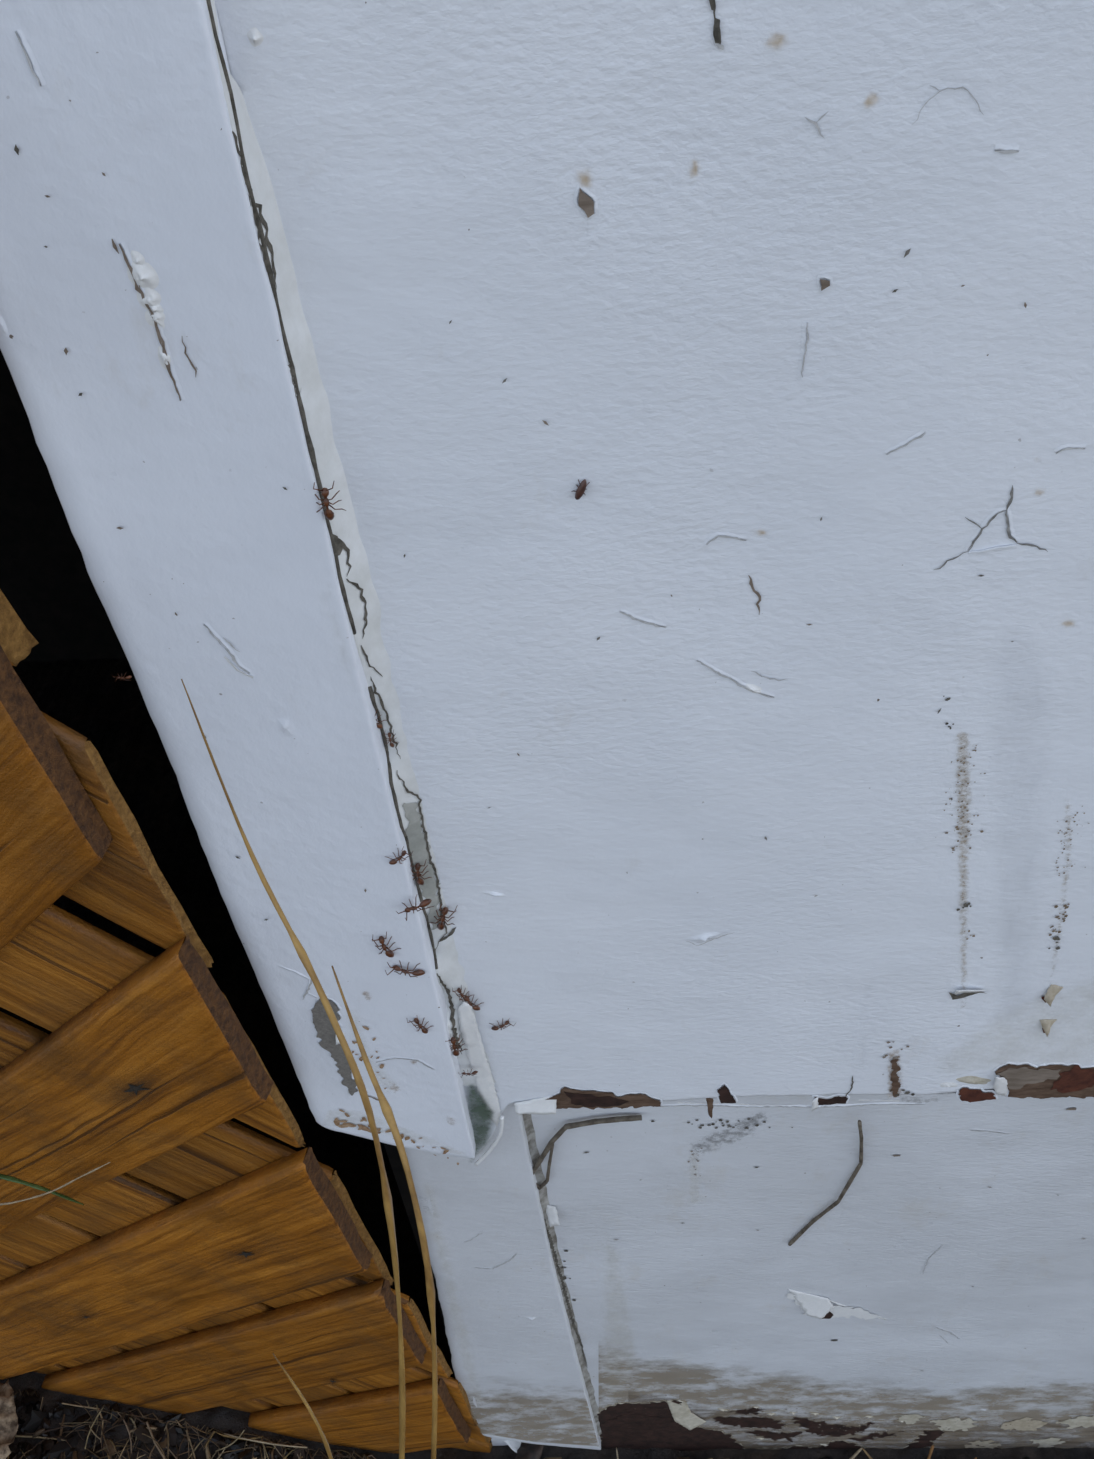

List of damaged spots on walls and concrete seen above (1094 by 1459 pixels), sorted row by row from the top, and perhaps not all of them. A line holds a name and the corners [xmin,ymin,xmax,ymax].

crack [204,0,462,1070]
crack [934,485,1048,570]
peeling [279,965,379,1101]
peeling [458,1001,663,1166]
peeling [940,1061,1094,1110]
peeling [787,1289,886,1320]